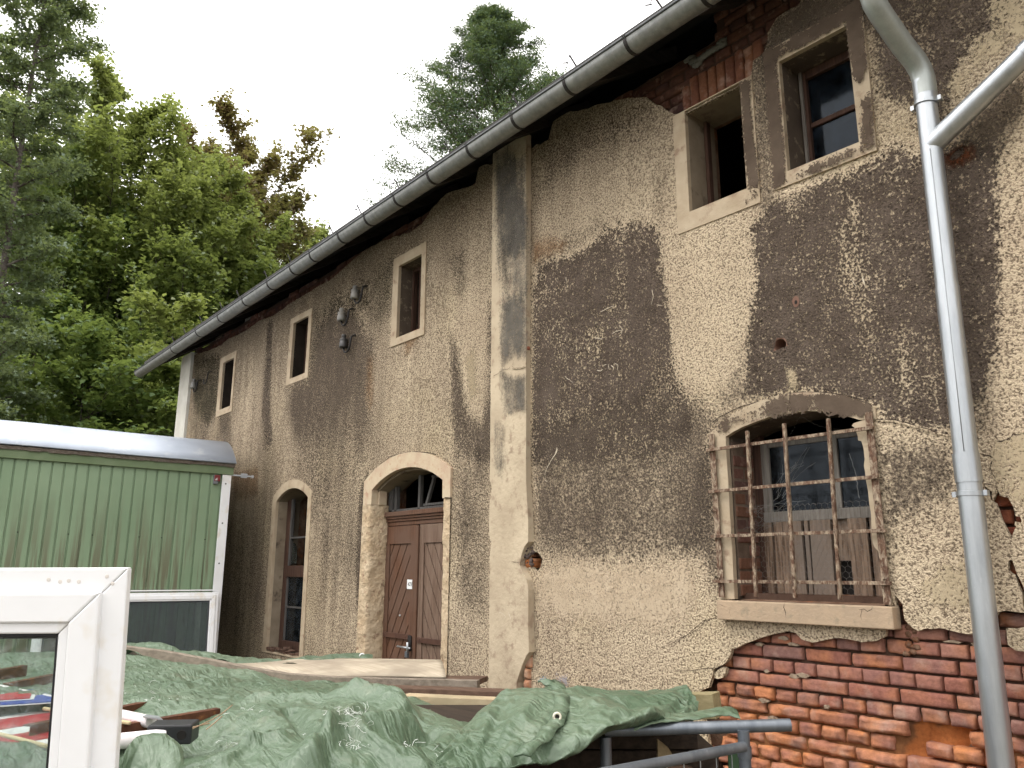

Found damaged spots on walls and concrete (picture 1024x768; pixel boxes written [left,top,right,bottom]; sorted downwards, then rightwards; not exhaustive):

flaking render [613,0,916,204]
leakage [888,0,1020,121]
flaking render [951,0,1024,96]
flaking render [195,247,370,354]
flaking render [382,211,430,241]
leakage [447,0,956,615]
leakage [943,73,1024,440]
flaking render [987,433,1024,535]
flaking render [524,546,697,633]
flaking render [734,593,884,606]
flaking render [701,599,987,768]
flaking render [998,611,1024,768]